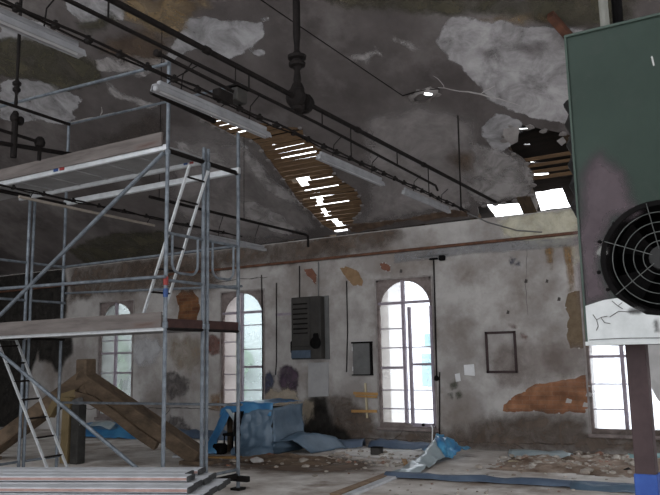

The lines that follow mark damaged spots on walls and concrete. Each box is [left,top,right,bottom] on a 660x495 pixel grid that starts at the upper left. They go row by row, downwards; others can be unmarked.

peeling [96,16,265,77]
peeling [0,78,82,125]
peeling [345,17,568,232]
peeling [242,140,307,211]
peeling [243,201,295,235]
flaking render [340,266,363,286]
flaking render [176,290,200,320]
flaking render [557,291,589,349]
flaking render [503,375,592,414]